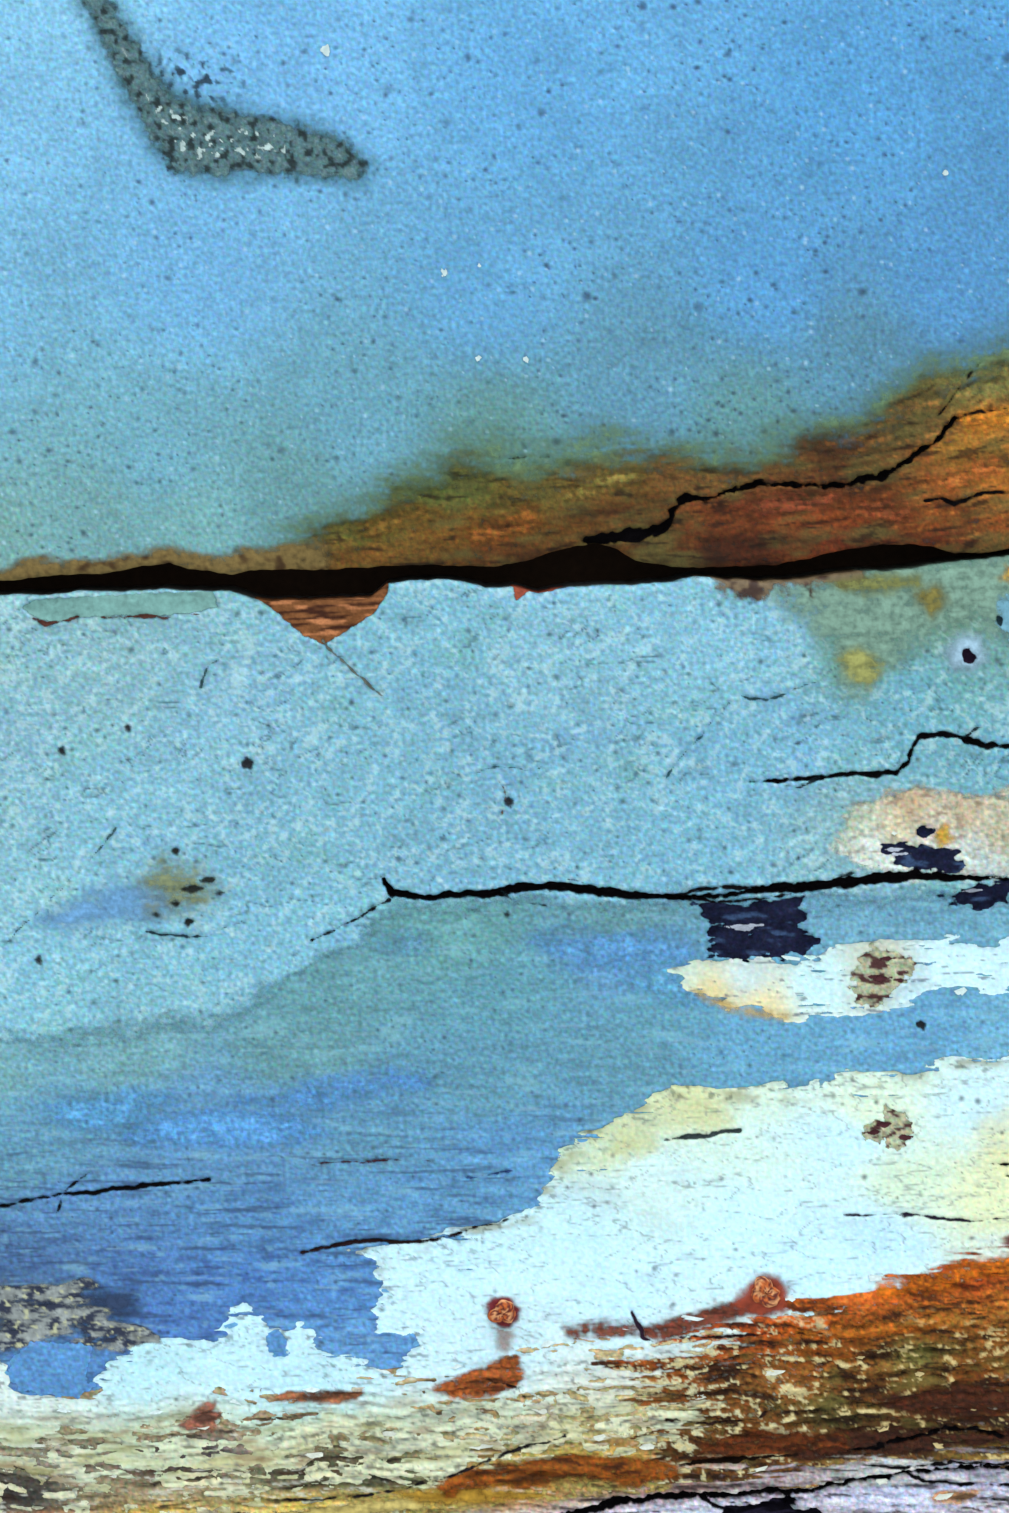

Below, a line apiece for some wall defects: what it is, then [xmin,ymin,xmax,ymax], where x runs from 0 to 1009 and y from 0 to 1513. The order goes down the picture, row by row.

corrosion [290,347,1009,569]
crack [750,727,1009,788]
crack [310,865,1009,942]
crack [0,1174,211,1213]
peeling [0,787,1009,1513]
corrosion [433,1236,1009,1498]
crack [237,1434,566,1513]
crack [566,1411,1009,1513]